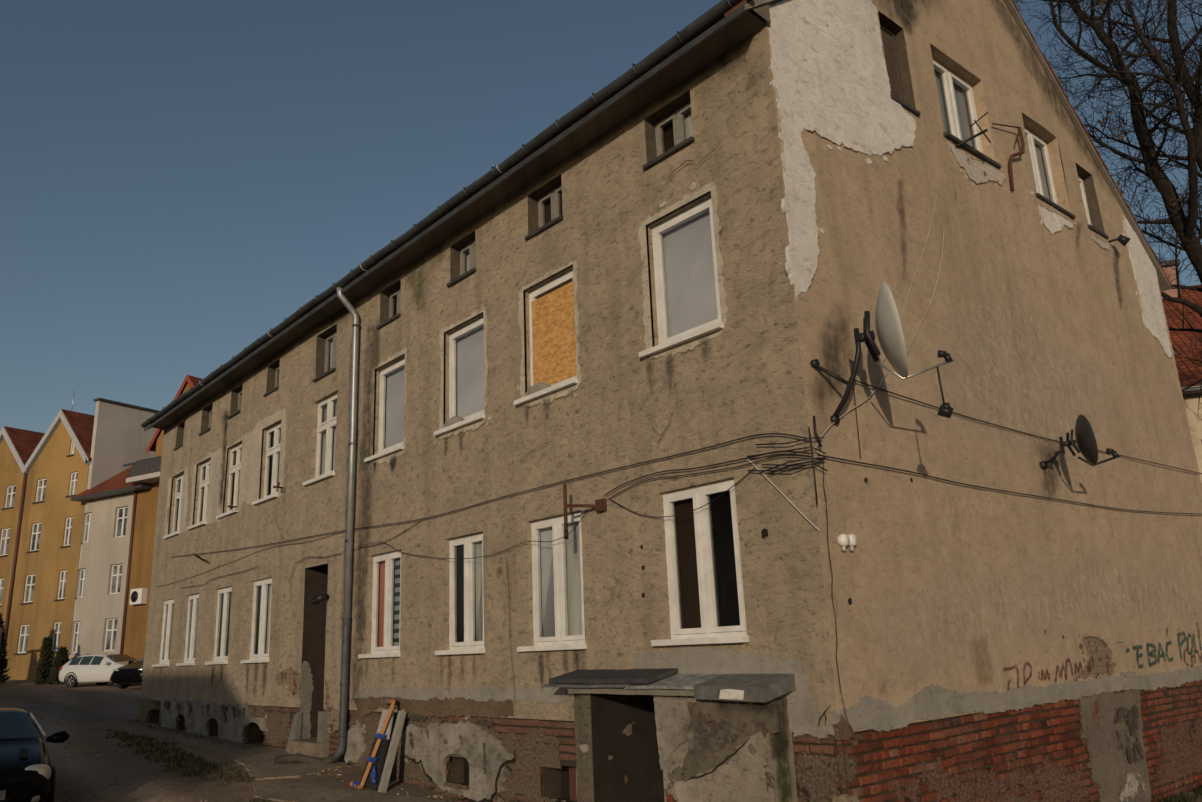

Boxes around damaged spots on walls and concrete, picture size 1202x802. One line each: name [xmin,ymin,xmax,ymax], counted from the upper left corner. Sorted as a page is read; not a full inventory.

flaking render [768,0,917,300]
flaking render [947,141,1006,190]
flaking render [1030,191,1077,236]
flaking render [1091,234,1110,251]
flaking render [1122,214,1172,359]
flaking render [1062,634,1116,682]
flaking render [653,695,780,802]